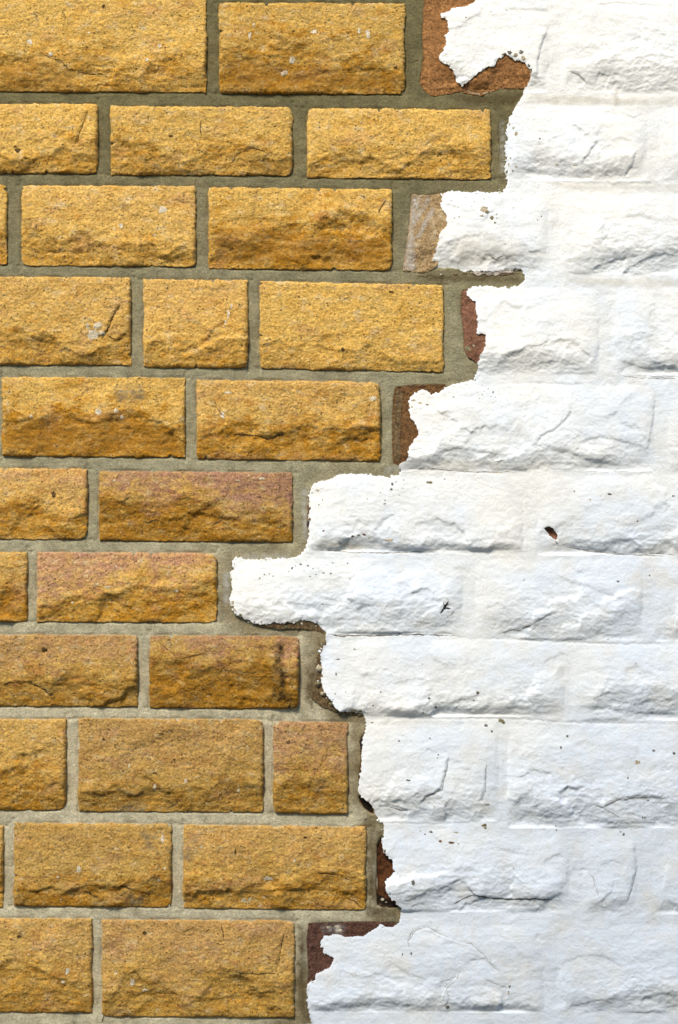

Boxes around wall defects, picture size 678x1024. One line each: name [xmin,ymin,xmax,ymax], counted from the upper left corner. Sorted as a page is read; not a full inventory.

peeling [420,0,532,96]
peeling [403,192,497,273]
peeling [461,290,486,363]
peeling [392,384,454,465]
spalling [229,557,374,723]
peeling [376,819,399,908]
peeling [306,921,398,1024]